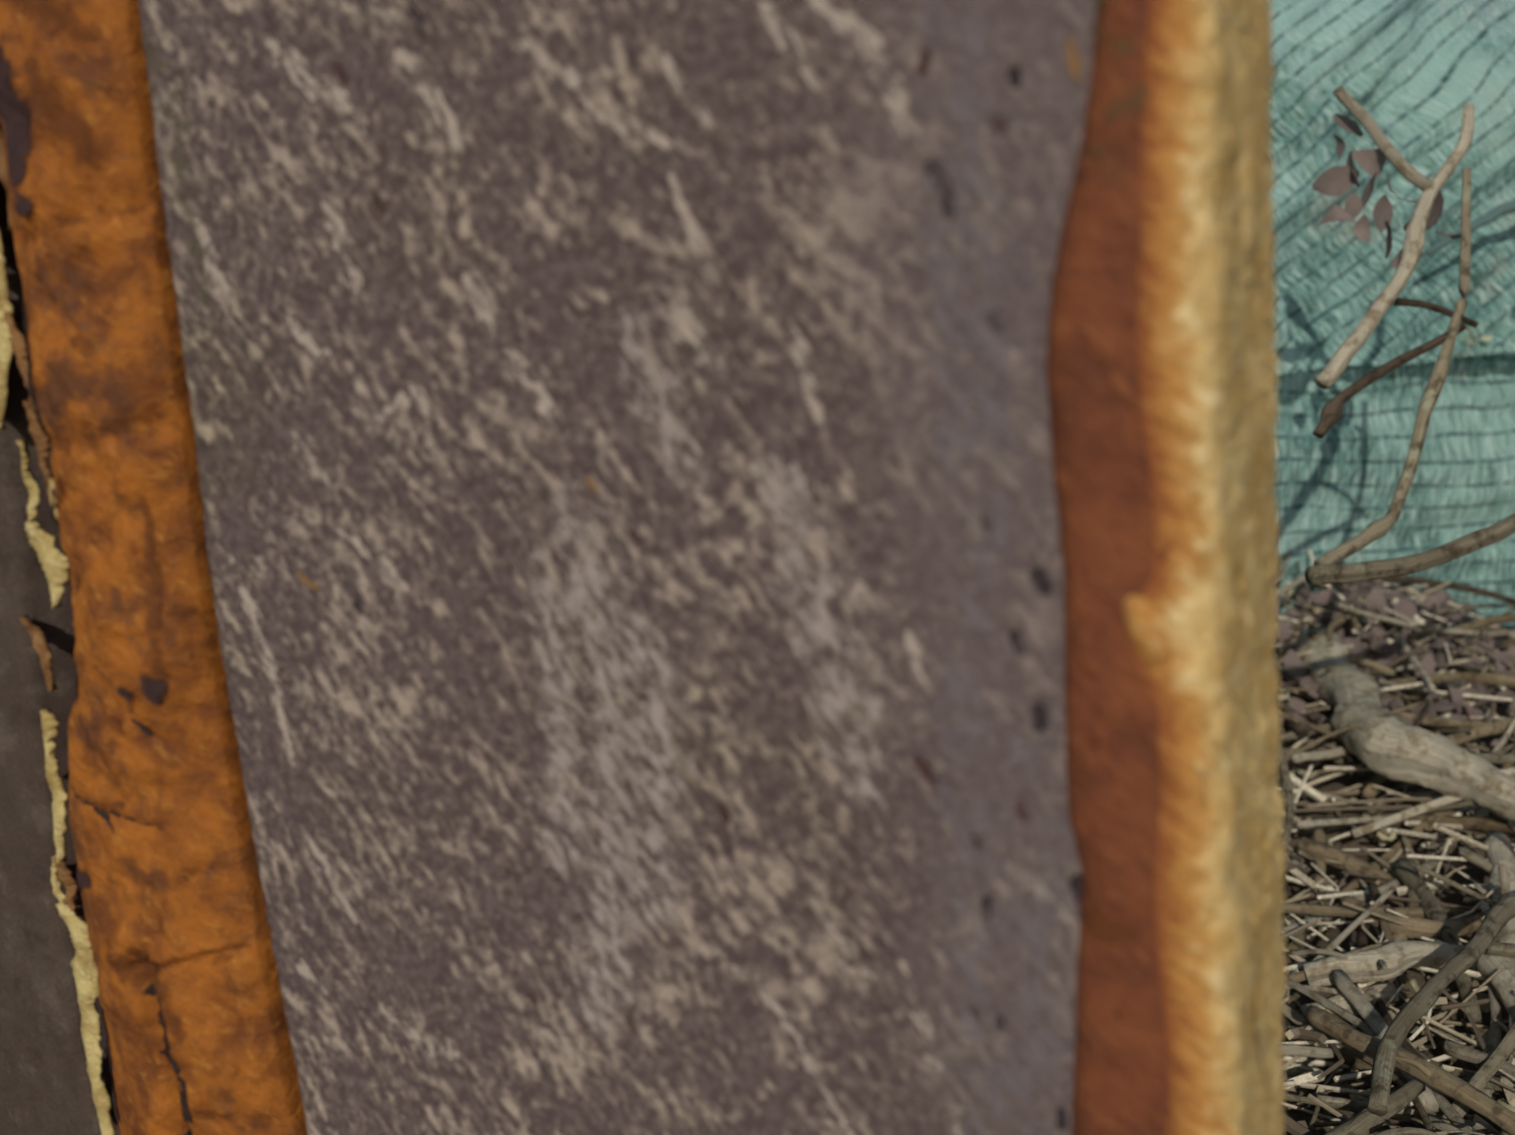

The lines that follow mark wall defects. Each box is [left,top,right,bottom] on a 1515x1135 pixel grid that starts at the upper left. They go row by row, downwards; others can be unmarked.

peeling [0,128,70,609]
peeling [19,615,116,1135]
crack [74,793,162,833]
crack [146,955,192,1135]